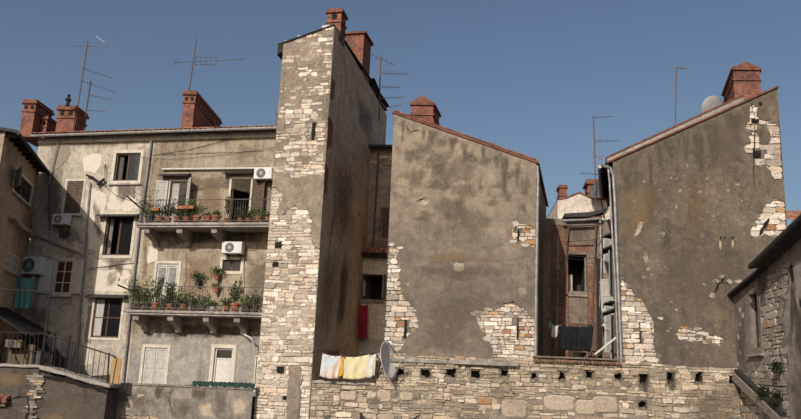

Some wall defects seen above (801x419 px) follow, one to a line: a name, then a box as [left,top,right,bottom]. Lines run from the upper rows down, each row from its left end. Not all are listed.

flaking render [274,25,335,206]
flaking render [744,102,783,182]
peeling [58,185,141,366]
flaking render [254,188,321,419]
flaking render [384,243,418,353]
flaking render [471,302,534,361]
flaking render [510,221,536,247]
flaking render [614,279,663,366]
flaking render [667,326,724,347]
flaking render [744,197,786,240]
flaking render [737,262,801,419]
flaking render [22,373,107,419]